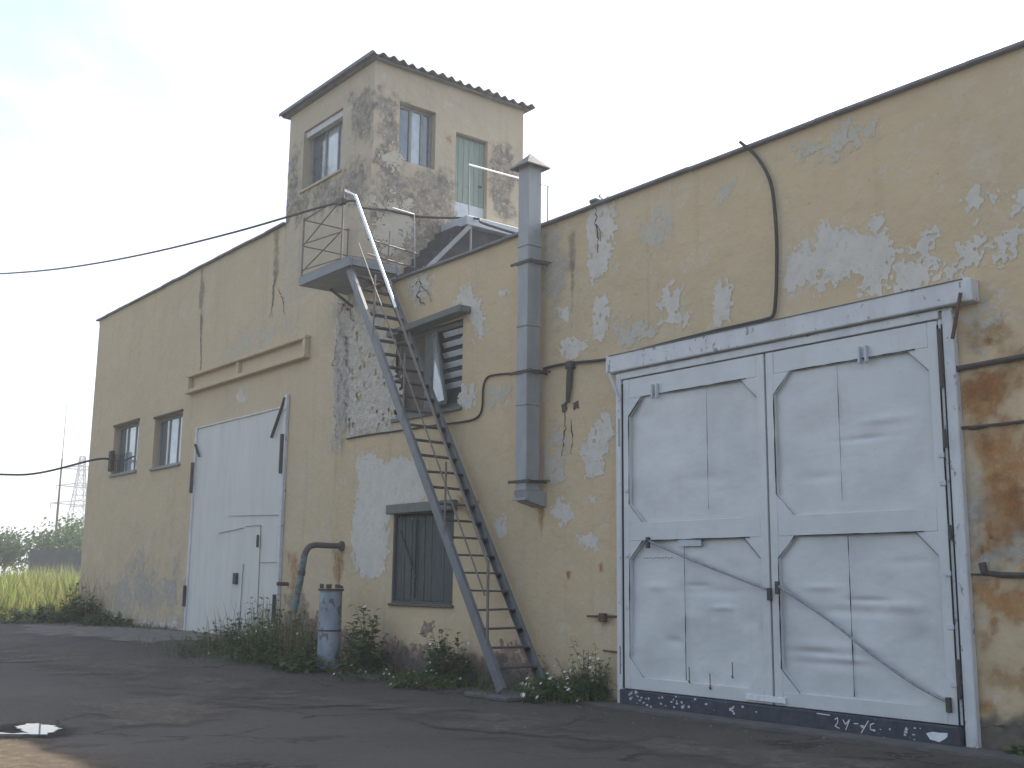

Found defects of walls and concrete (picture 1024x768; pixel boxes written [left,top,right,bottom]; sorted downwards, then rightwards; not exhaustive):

leakage [286,86,456,261]
peeling [789,117,880,169]
crack [593,208,601,252]
peeling [779,184,1024,298]
peeling [453,283,489,345]
peeling [712,273,735,327]
peeling [334,292,433,586]
crack [561,414,573,454]
peeling [540,401,616,528]